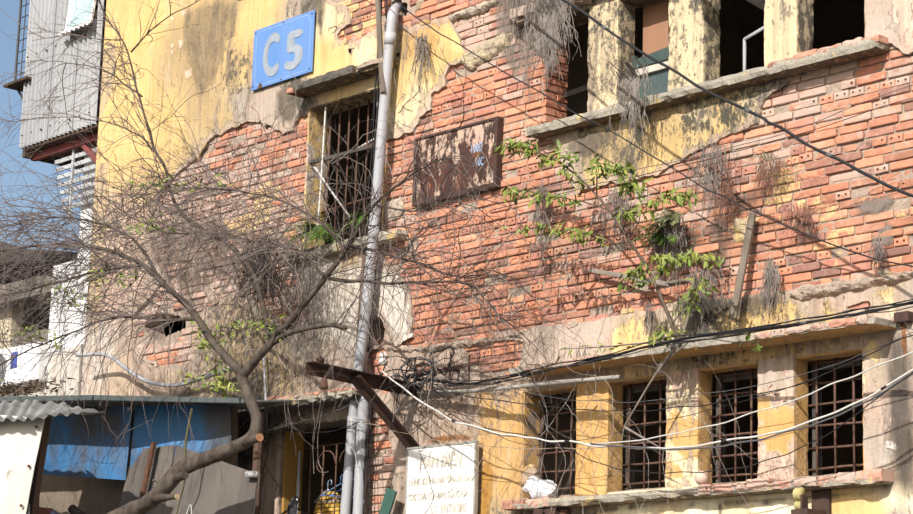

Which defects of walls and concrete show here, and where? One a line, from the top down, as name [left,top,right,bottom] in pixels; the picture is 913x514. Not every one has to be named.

mould [681,88,756,135]
flaking render [335,0,913,381]
leakage [886,338,912,485]